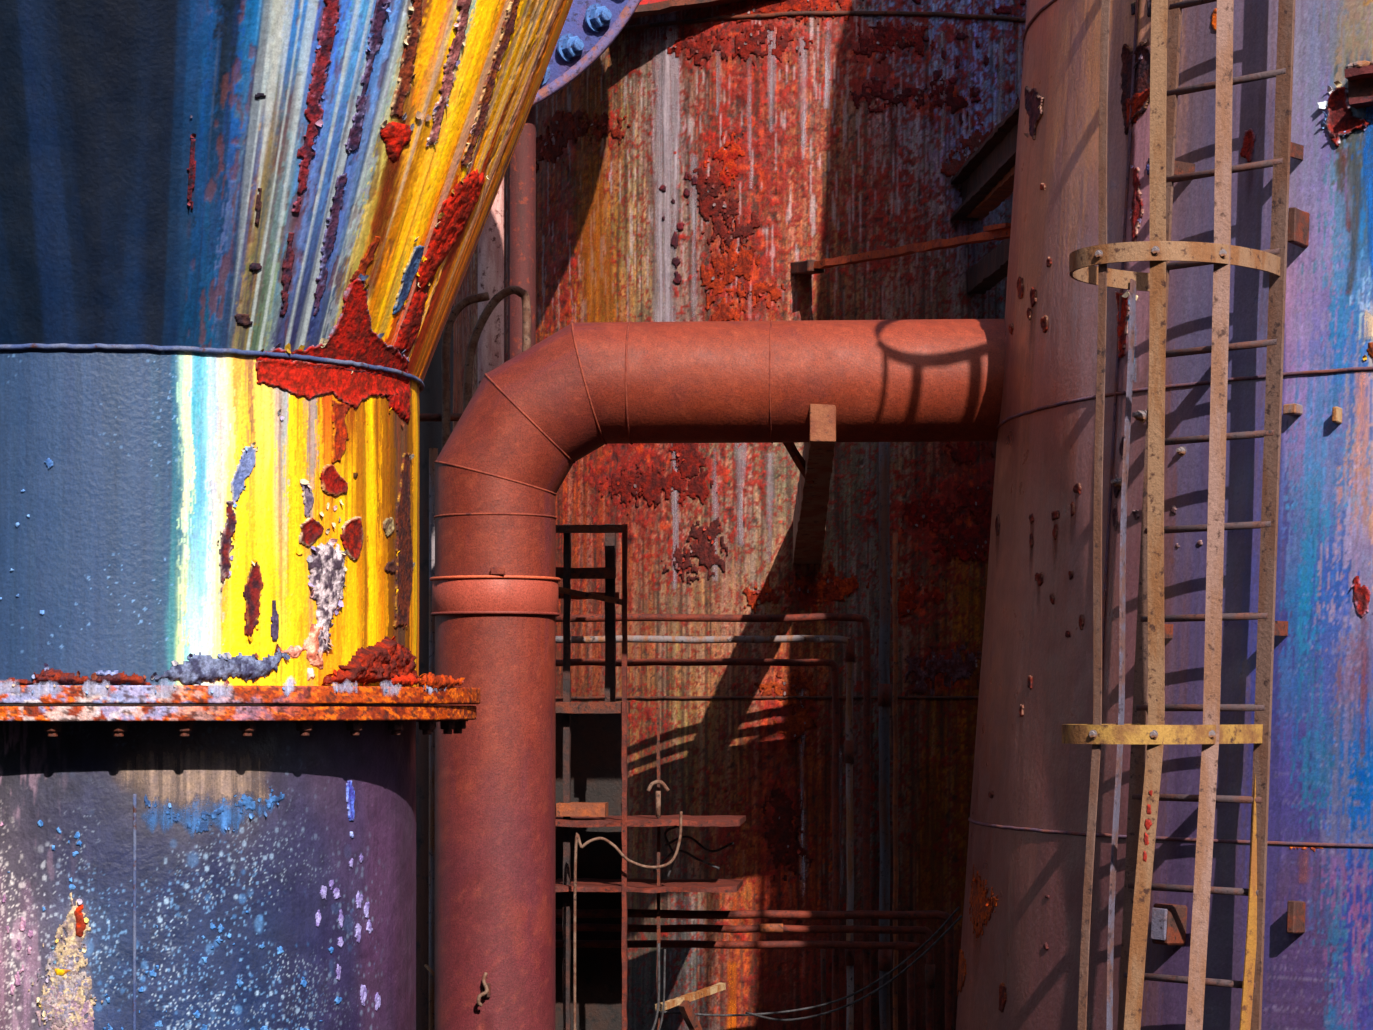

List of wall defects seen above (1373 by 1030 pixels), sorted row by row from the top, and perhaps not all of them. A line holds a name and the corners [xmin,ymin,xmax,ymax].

peeling [292,0,340,213]
peeling [345,0,391,152]
peeling [426,0,472,146]
peeling [1318,80,1369,147]
peeling [280,232,295,316]
peeling [313,173,348,316]
peeling [392,237,424,315]
corrosion [790,223,1011,275]
peeling [383,452,415,642]
peeling [37,820,82,857]
peeling [6,877,123,1030]
corrosion [969,864,998,941]